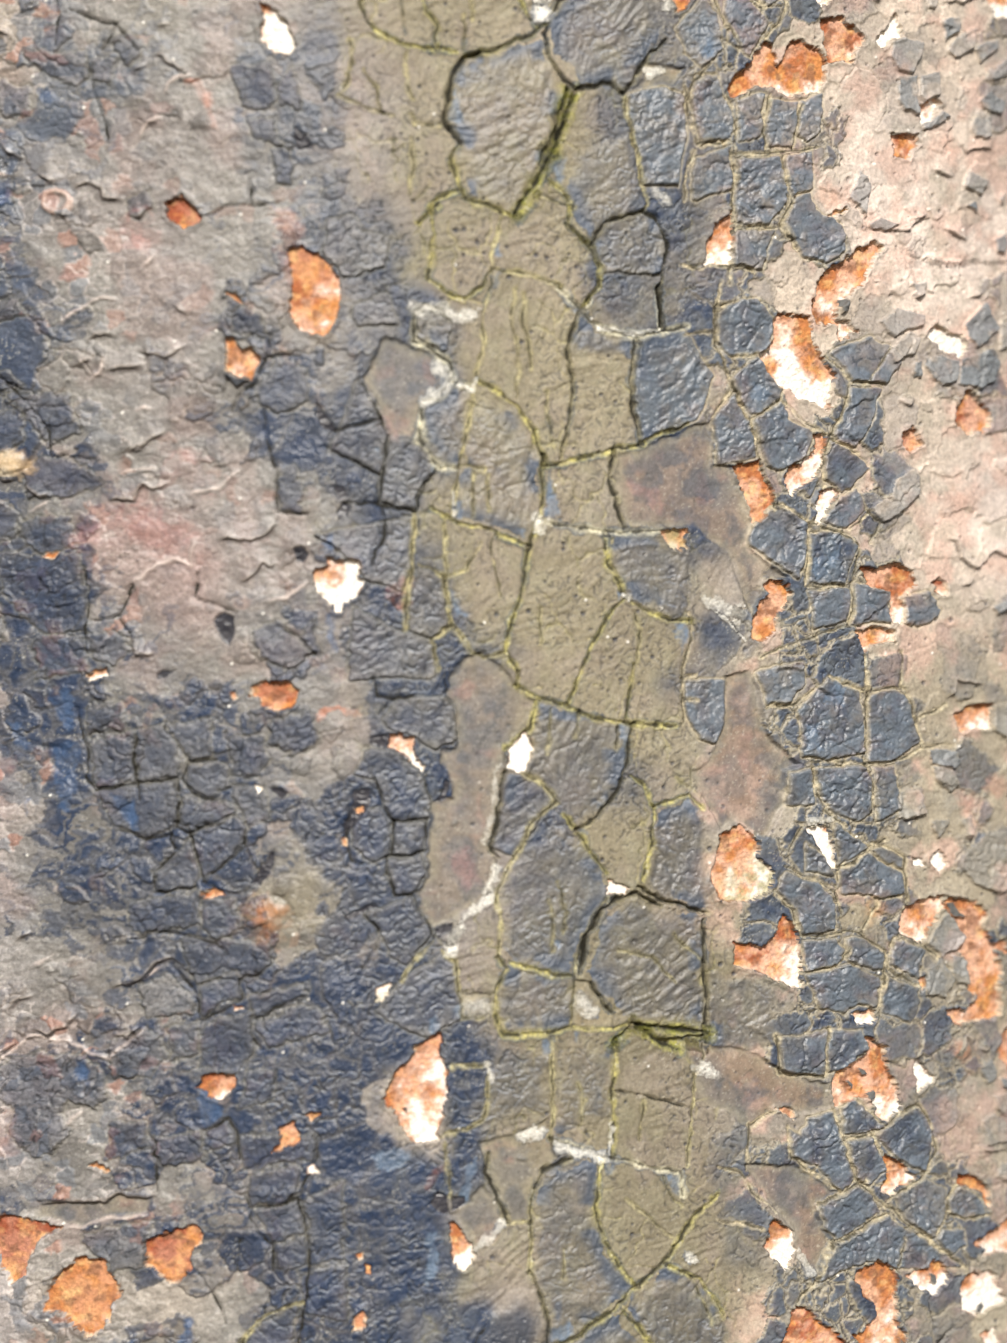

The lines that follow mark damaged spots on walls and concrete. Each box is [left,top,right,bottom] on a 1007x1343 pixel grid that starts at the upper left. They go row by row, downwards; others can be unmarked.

crack [208,187,266,216]
corrosion [759,240,885,412]
peeling [812,0,1007,616]
crack [231,332,308,516]
crack [326,0,993,1343]
corrosion [711,823,776,903]
peeling [806,823,837,869]
peeling [894,703,1007,1009]
corrosion [381,1031,449,1144]
peeling [932,1032,1007,1205]
crack [198,1118,320,1343]
corrosion [781,1218,1007,1343]